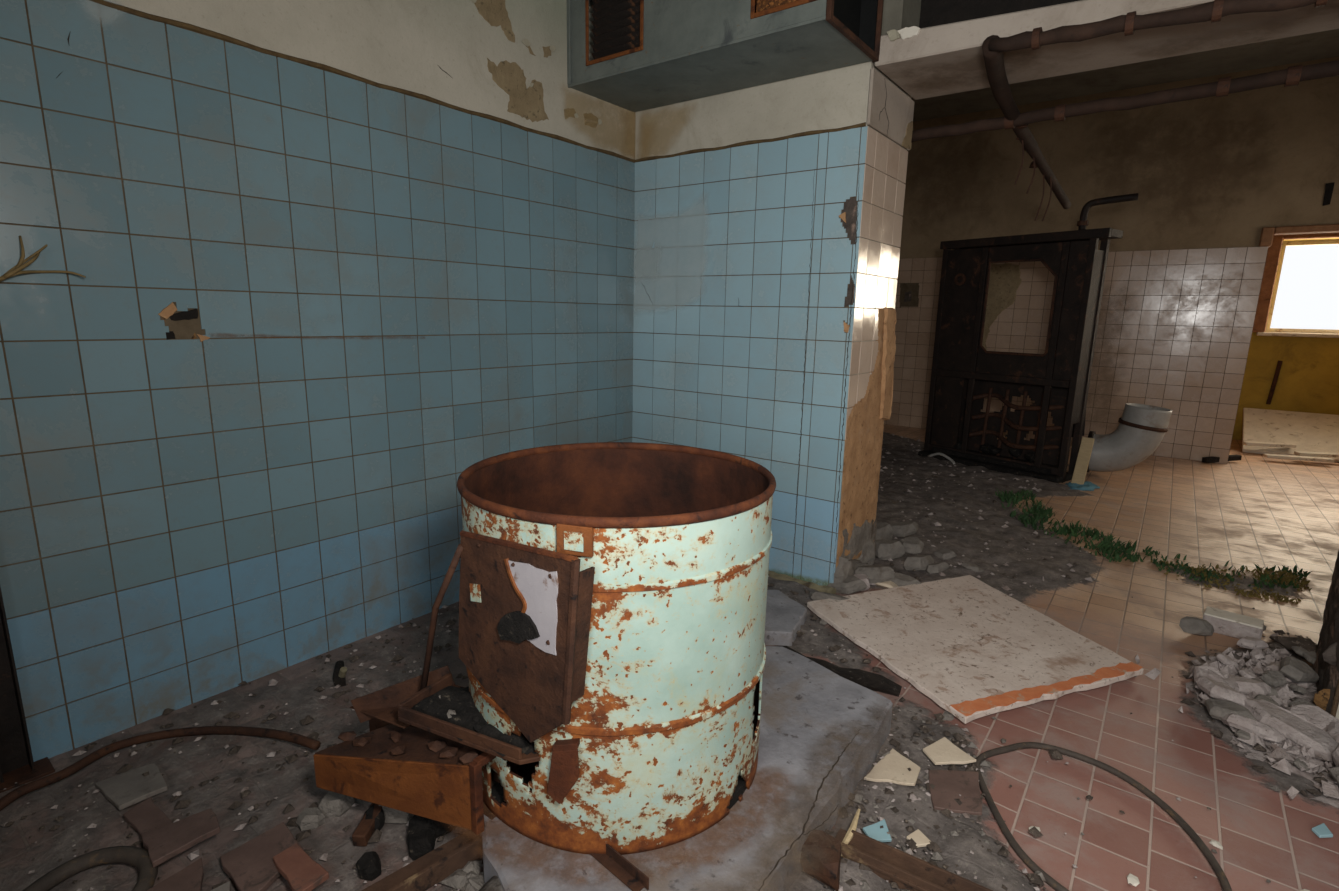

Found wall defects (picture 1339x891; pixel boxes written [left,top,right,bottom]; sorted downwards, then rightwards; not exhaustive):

peeling [471,0,555,58]
peeling [487,58,602,128]
spalling [158,302,210,342]
flaking render [834,307,897,594]
spalling [1312,550,1339,714]